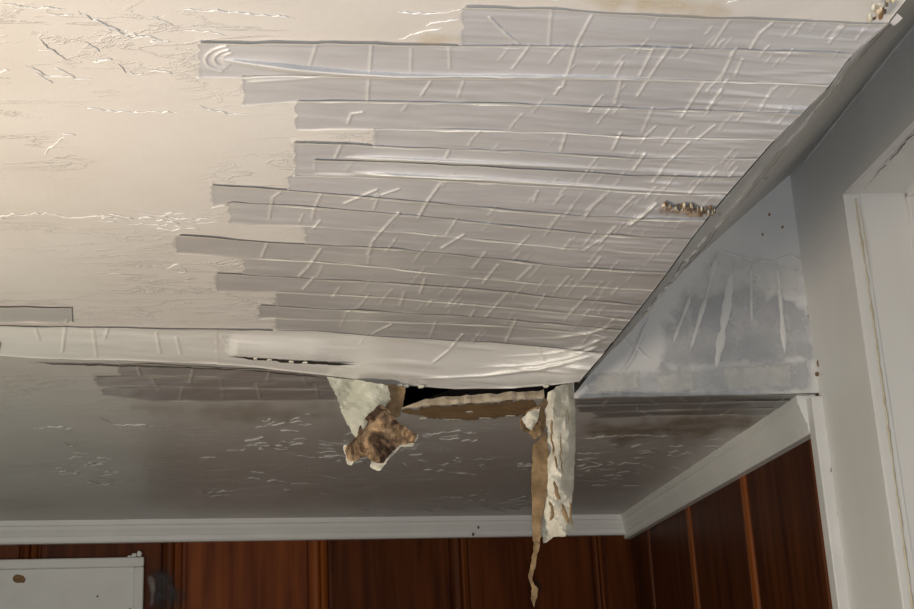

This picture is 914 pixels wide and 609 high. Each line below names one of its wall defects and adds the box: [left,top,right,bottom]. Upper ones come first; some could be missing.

peeling [228,377,494,475]
peeling [426,376,693,606]